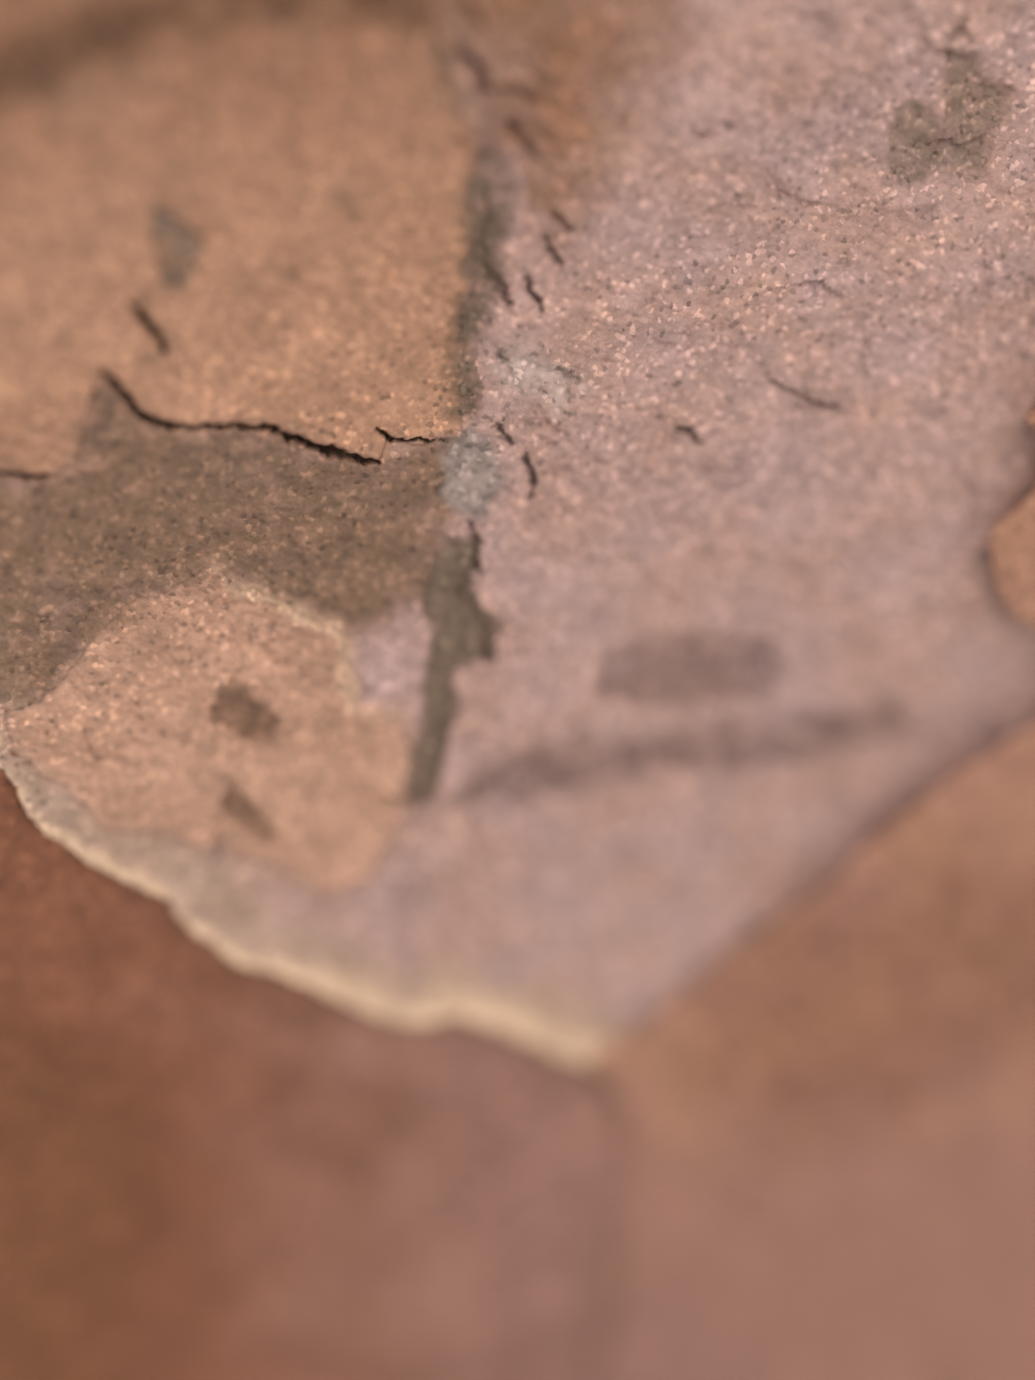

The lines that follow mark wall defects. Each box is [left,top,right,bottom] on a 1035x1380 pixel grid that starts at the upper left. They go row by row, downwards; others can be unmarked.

crack [458,0,551,157]
crack [495,210,571,304]
crack [127,302,167,353]
crack [497,350,521,386]
crack [99,371,448,462]
crack [0,470,52,479]
crack [498,424,538,498]
crack [468,520,481,584]
crack [483,646,498,661]
spalling [213,690,275,737]